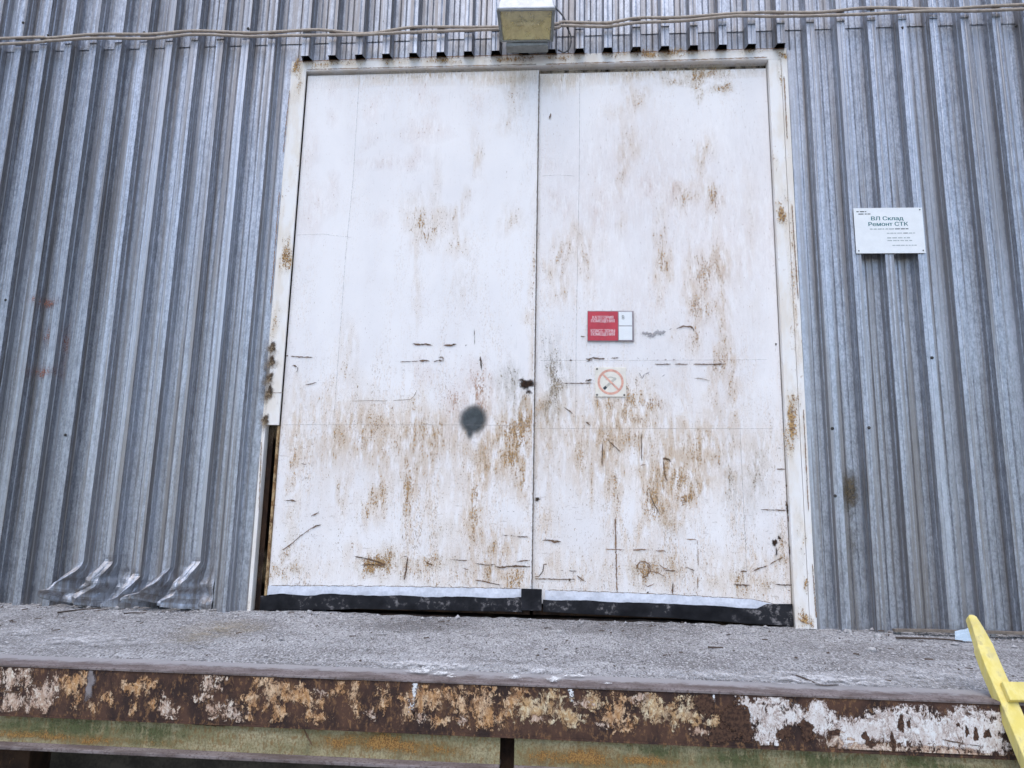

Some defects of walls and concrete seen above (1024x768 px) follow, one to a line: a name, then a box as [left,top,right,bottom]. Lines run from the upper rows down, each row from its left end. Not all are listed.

rust [775,197,798,315]
rust [319,339,573,588]
rust [565,377,741,592]
rust [783,390,809,511]
rust [318,733,467,756]
rust [690,694,755,744]
rust [775,718,814,742]
peeling [734,696,1012,756]